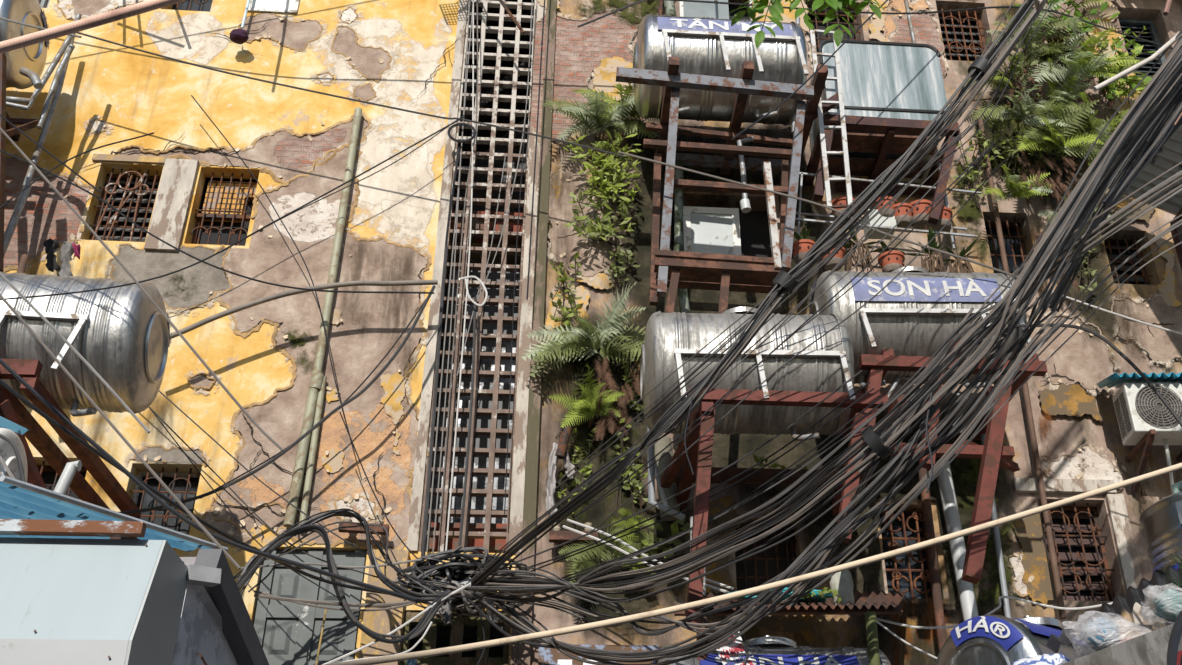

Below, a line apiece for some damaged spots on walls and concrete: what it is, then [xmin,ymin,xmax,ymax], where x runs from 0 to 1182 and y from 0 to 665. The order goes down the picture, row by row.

peeling [50,0,147,20]
peeling [84,116,114,137]
peeling [105,5,431,551]